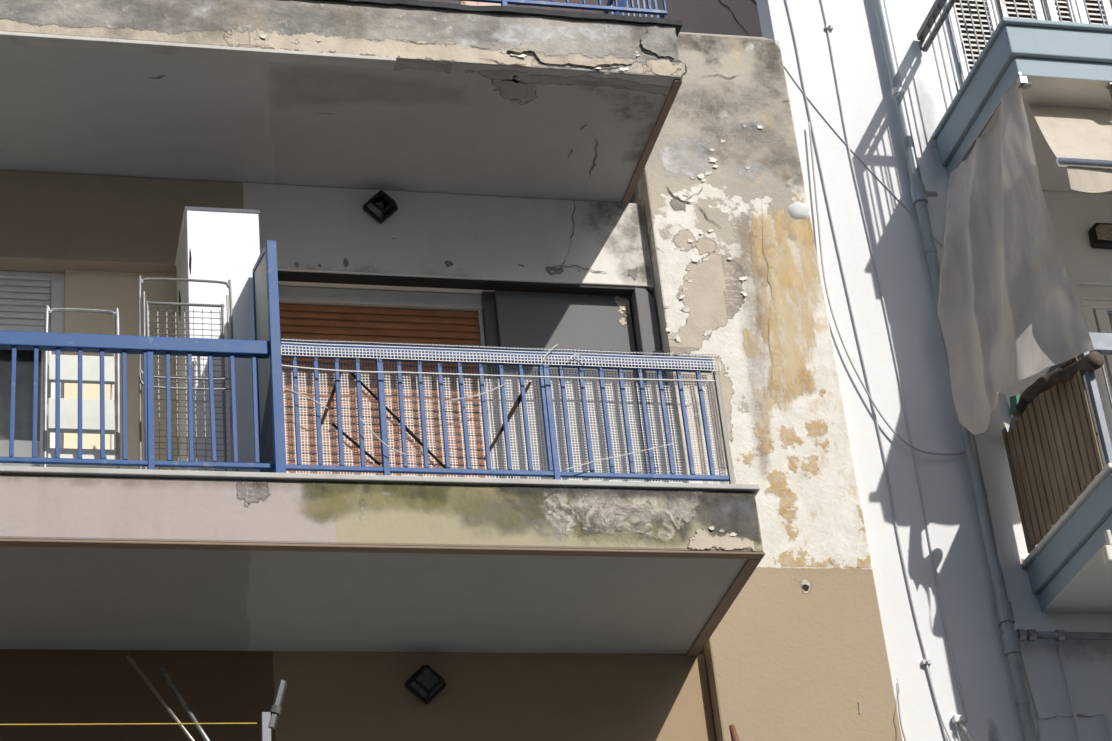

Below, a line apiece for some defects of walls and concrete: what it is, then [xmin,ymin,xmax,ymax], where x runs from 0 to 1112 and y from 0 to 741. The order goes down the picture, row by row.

crack [719,0,757,33]
spalling [224,21,682,105]
crack [475,26,735,80]
water stain [743,39,780,70]
crack [568,124,598,176]
peeling [661,137,726,211]
crack [547,202,607,273]
peeling [614,296,630,325]
peeling [664,229,872,594]
water stain [304,481,371,519]
water stain [501,486,761,542]
peeling [564,489,756,551]